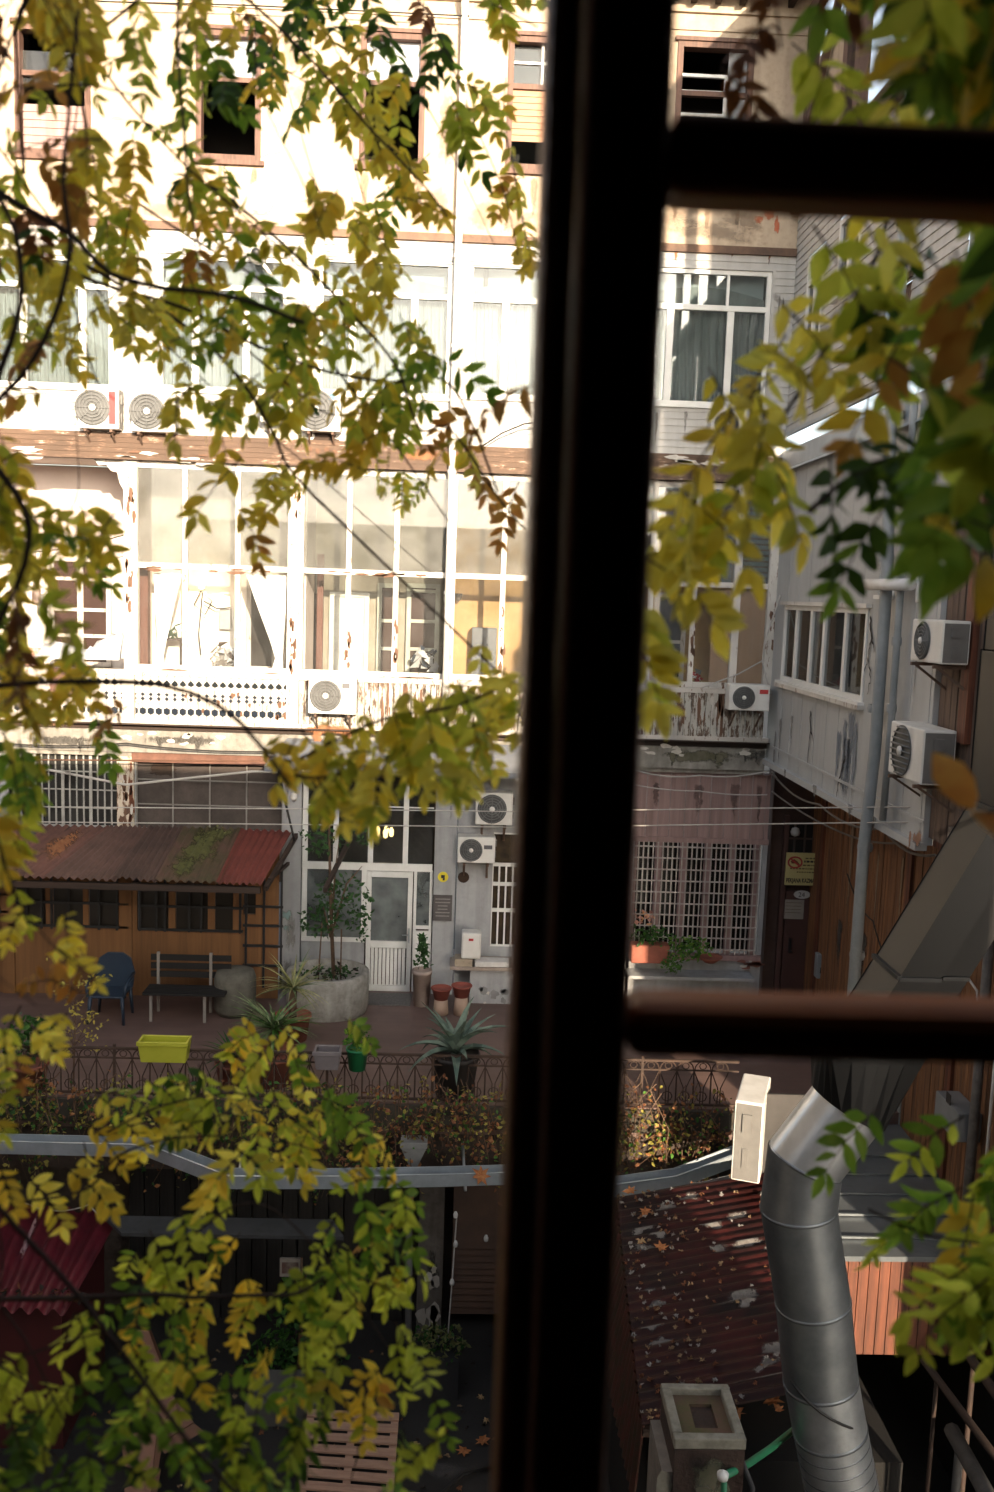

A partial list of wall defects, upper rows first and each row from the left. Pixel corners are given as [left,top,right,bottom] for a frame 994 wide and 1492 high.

peeling [126,487,136,524]
peeling [674,683,724,737]
spalling [640,743,684,757]